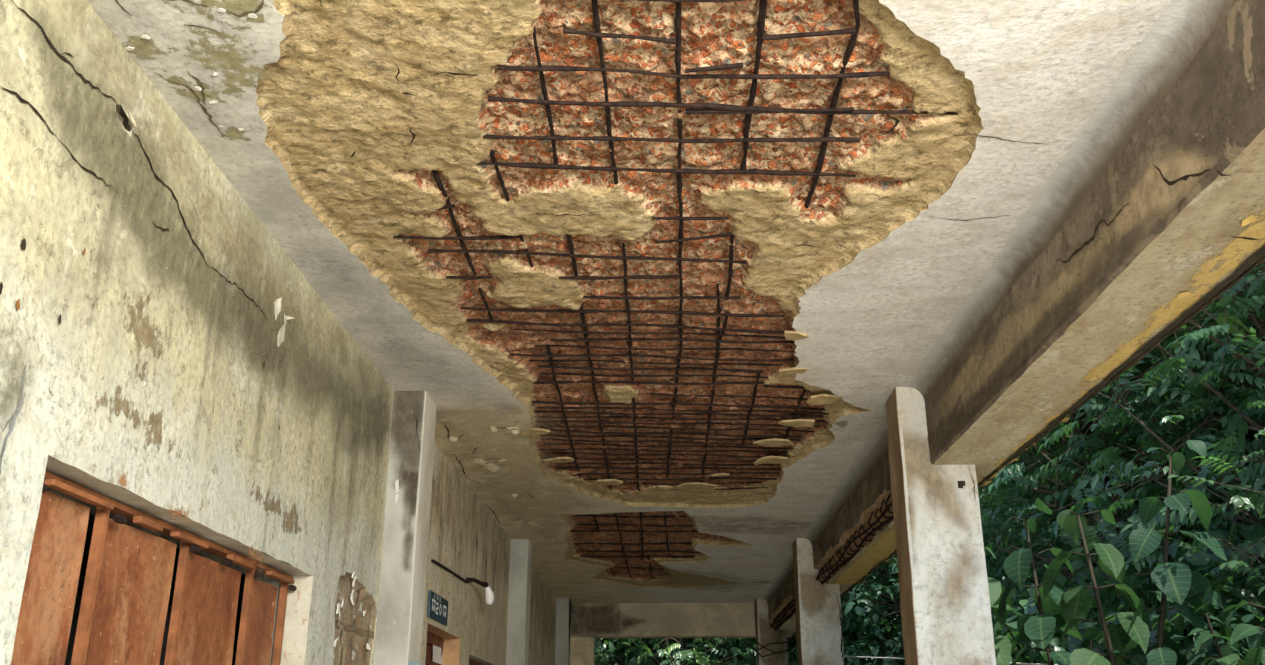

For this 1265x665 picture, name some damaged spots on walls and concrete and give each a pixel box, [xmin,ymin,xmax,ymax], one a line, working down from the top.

spalling [116,104,136,132]
crack [0,0,272,330]
flaking render [96,292,181,460]
damp [40,24,424,508]
spalling [125,0,983,588]
crack [1056,203,1129,263]
peeling [958,209,1265,488]
crack [1154,165,1230,185]
spalling [333,571,377,665]
spalling [769,594,796,631]